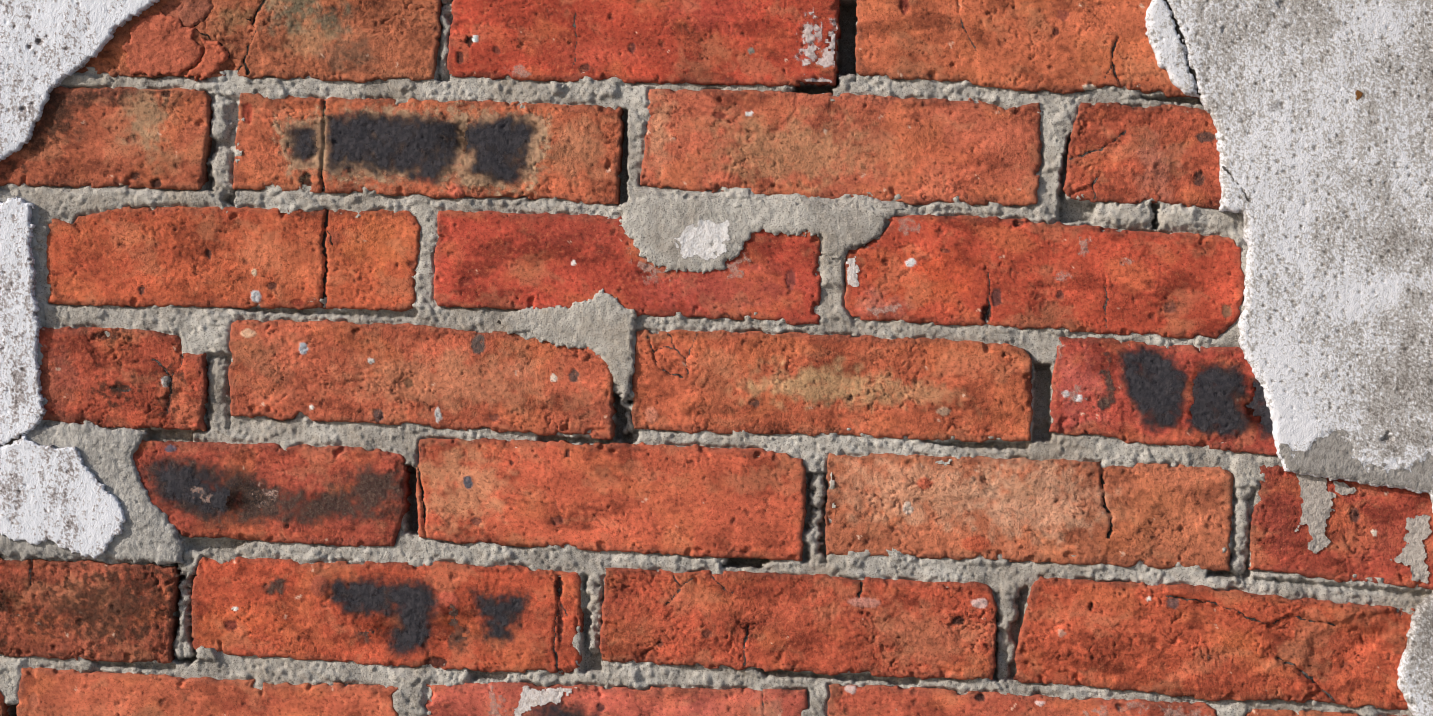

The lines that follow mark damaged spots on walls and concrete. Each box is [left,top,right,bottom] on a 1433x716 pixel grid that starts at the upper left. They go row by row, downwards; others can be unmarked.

spalling [122,0,229,81]
crack [194,0,266,75]
peeling [796,12,838,83]
spalling [0,188,45,381]
peeling [846,256,860,287]
flaking render [0,398,185,566]
flaking render [1279,429,1433,493]
peeling [514,685,577,716]